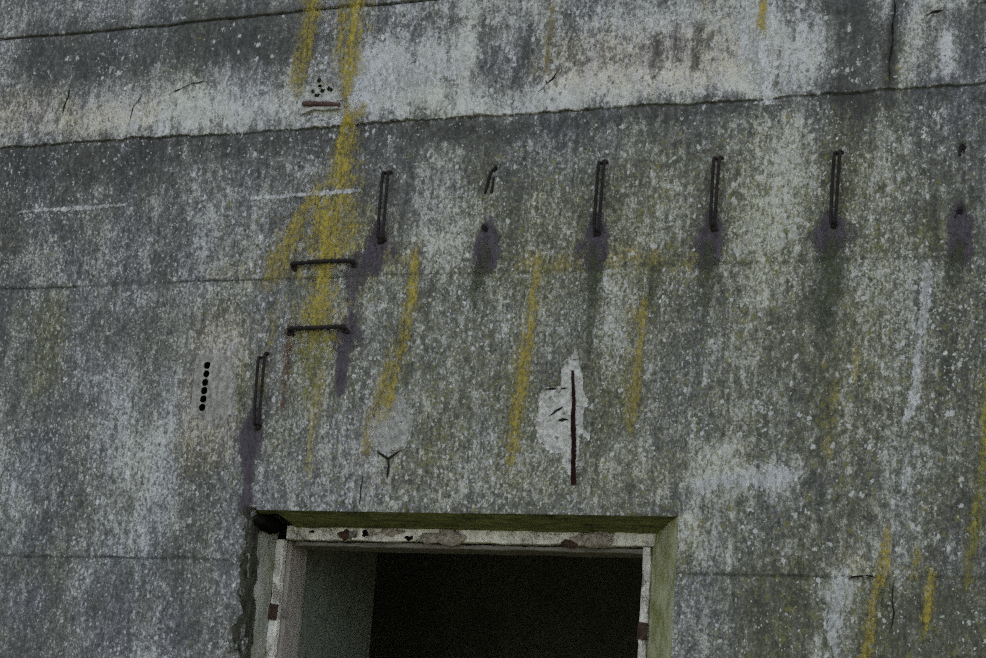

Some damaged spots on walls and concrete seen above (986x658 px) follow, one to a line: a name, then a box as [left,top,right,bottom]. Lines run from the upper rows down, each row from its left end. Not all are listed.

crack [0,0,437,41]
crack [806,0,896,96]
crack [538,71,587,114]
crack [685,98,776,106]
spalling [534,349,593,485]